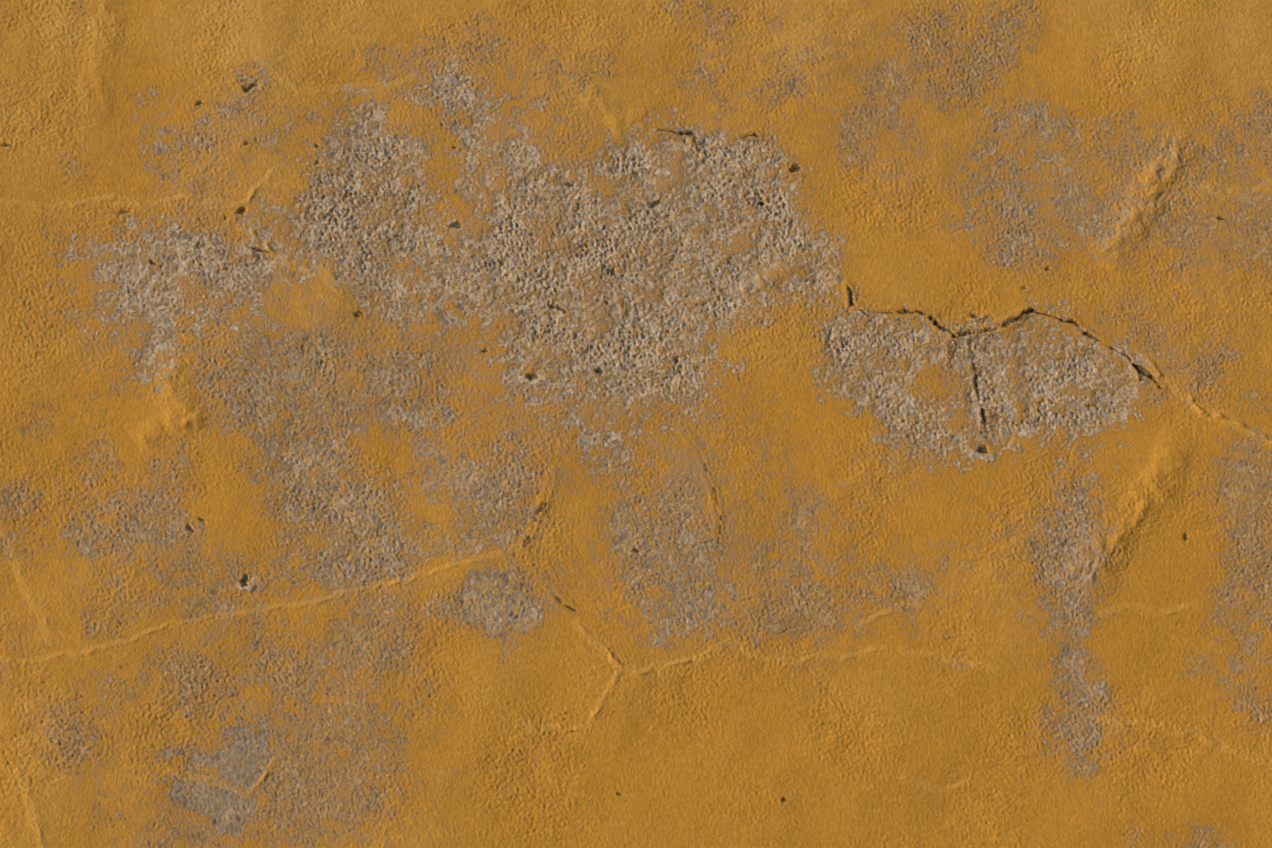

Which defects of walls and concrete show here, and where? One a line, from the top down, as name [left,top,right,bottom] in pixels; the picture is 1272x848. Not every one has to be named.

peeling [43,0,1272,543]
crack [849,288,1272,448]
peeling [47,437,471,774]
peeling [611,547,665,649]
peeling [718,487,837,632]
crack [1099,600,1203,619]
peeling [155,743,212,784]
crack [899,773,972,795]
crack [1097,715,1272,766]